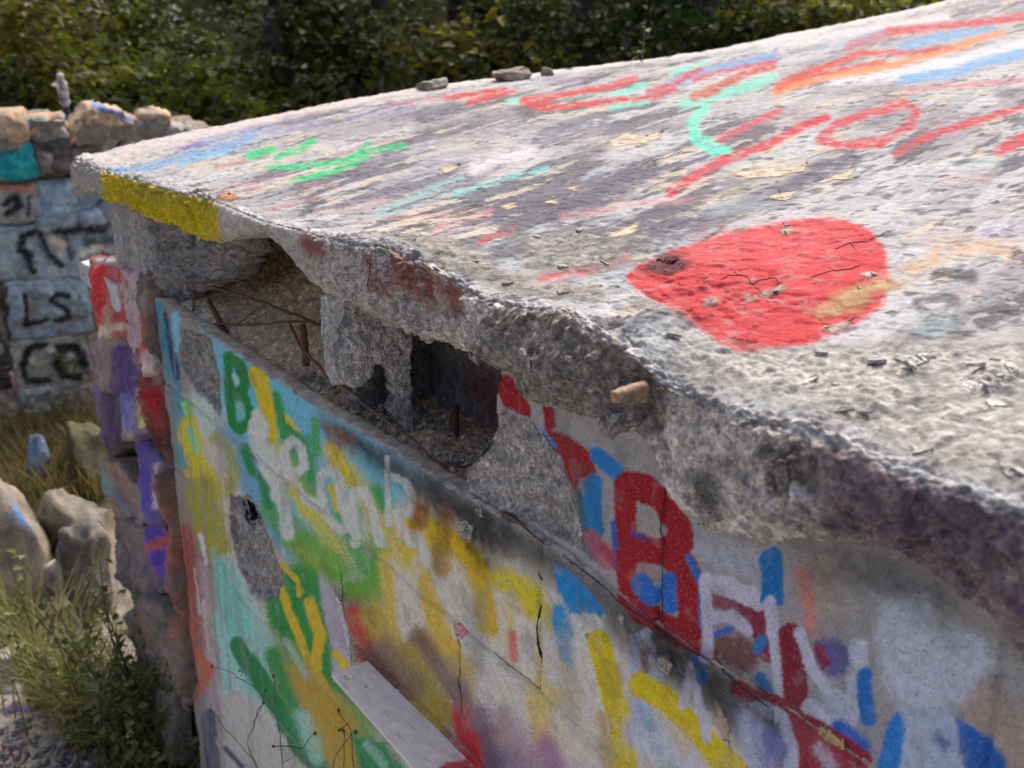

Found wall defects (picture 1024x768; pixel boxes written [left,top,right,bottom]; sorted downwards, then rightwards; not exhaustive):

spalling [382,231,603,299]
spalling [179,330,222,414]
spalling [206,298,229,334]
spalling [299,323,310,367]
spalling [229,496,285,600]
crack [494,572,543,692]
crack [563,490,770,708]